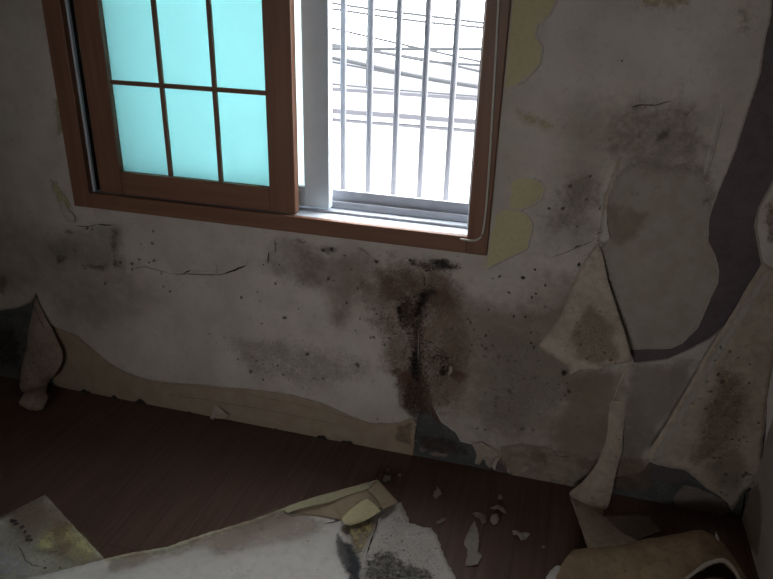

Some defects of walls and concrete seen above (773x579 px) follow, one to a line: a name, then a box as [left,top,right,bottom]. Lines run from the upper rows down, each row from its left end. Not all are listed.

peeling [505,0,558,88]
crack [137,262,248,275]
peeling [486,207,534,270]
peeling [538,0,773,548]
peeling [0,292,63,411]
water stain [51,256,610,487]
peeling [396,370,495,471]